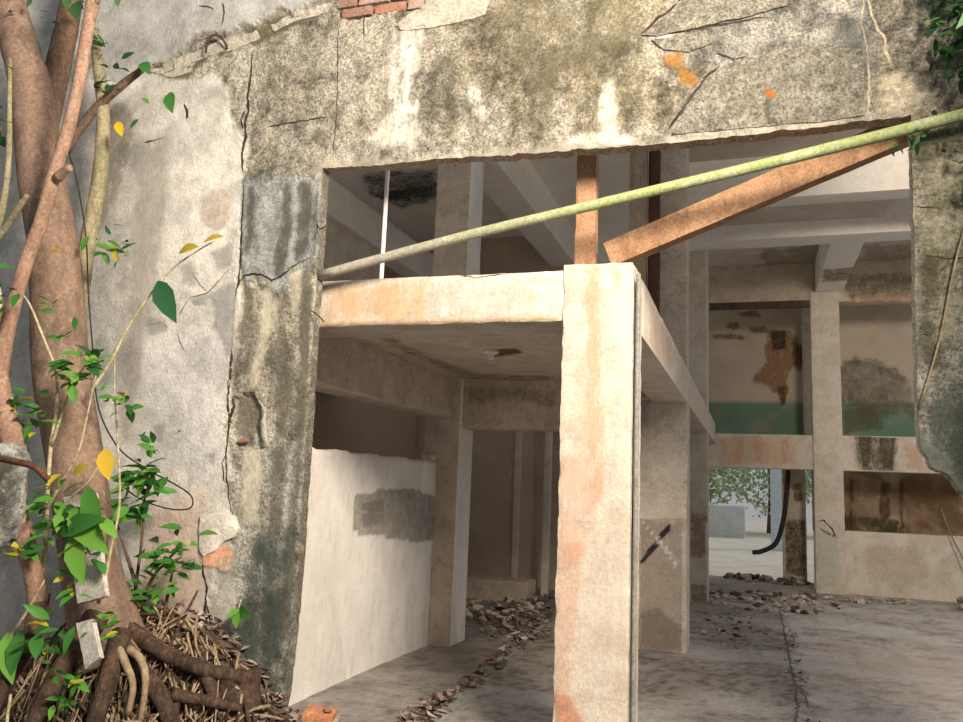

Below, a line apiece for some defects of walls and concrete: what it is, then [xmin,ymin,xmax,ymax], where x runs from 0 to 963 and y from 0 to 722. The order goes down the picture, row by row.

peeling [270,0,490,32]
crack [638,0,768,39]
spalling [150,30,260,78]
water stain [366,30,422,149]
water stain [569,81,633,146]
rust [665,52,697,85]
crack [666,53,746,131]
crack [150,18,339,514]
spalling [714,311,802,404]
water stain [194,180,320,692]
water stain [845,479,905,533]
peeling [199,513,240,572]